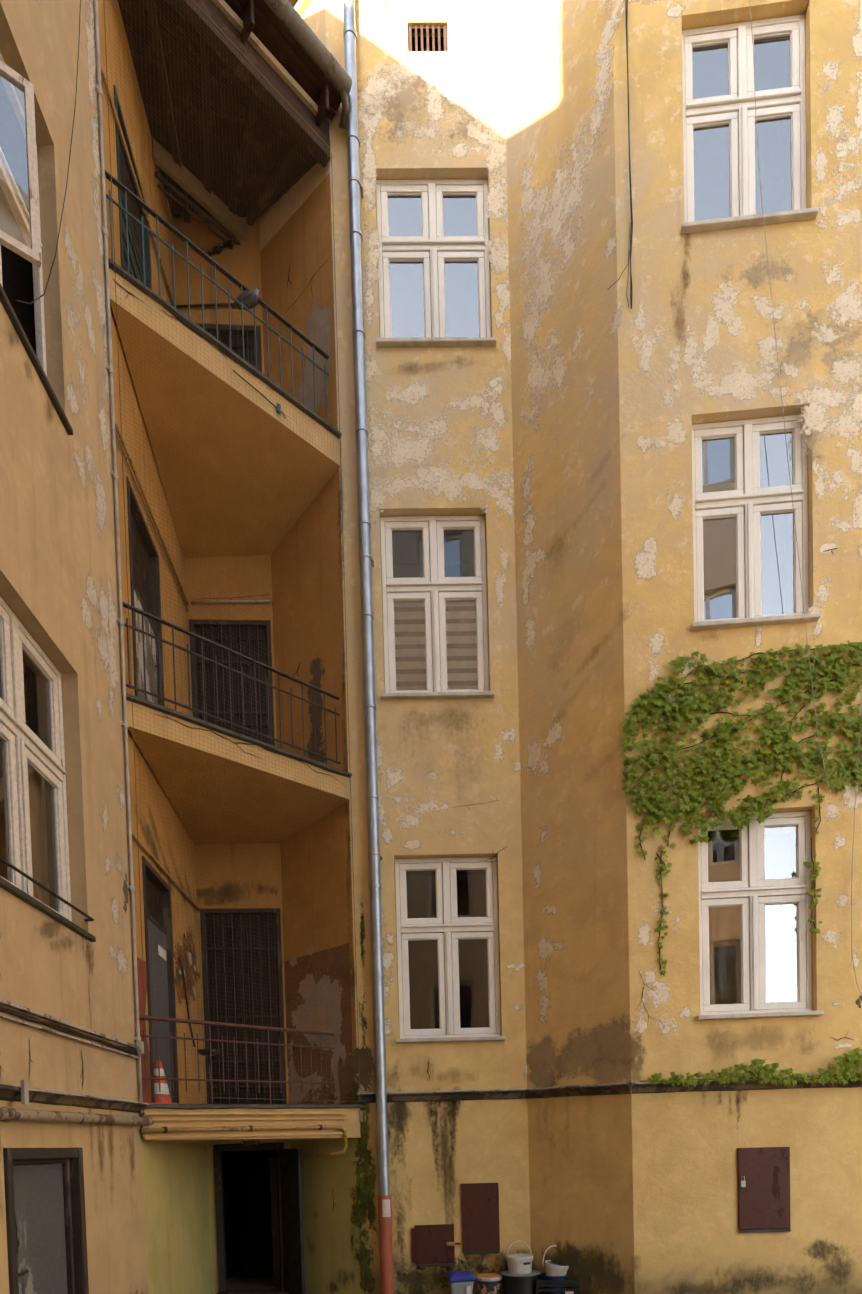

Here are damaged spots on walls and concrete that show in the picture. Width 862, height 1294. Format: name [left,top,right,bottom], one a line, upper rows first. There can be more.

peeling [815,0,862,228]
peeling [358,0,685,651]
peeling [610,262,862,640]
peeling [647,630,678,703]
peeling [679,656,696,675]
peeling [493,716,562,775]
peeling [637,904,680,946]
peeling [282,943,374,1104]
peeling [594,970,692,1084]
damp [429,1100,460,1205]
peeling [17,1208,54,1294]
damp [545,1246,624,1294]